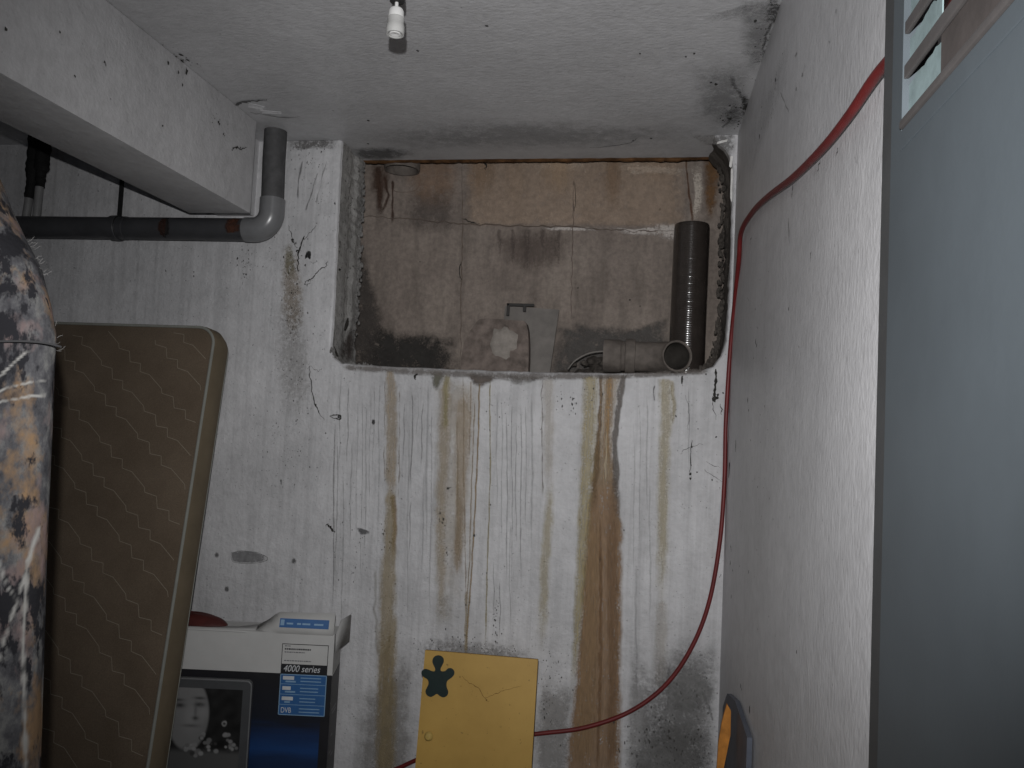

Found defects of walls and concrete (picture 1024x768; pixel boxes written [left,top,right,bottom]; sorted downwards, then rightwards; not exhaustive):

damp [754,2,780,62]
crack [288,225,327,286]
damp [342,258,450,369]
crack [366,162,674,355]
rust [569,378,624,768]